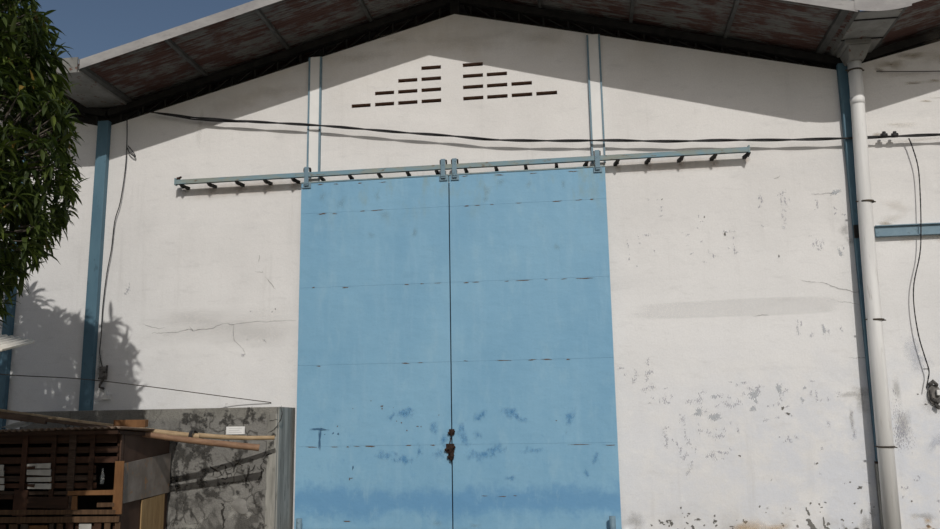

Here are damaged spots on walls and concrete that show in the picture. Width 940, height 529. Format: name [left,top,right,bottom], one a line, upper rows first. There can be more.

peeling [687,395,739,439]
crack [210,406,283,486]
peeling [796,502,830,529]